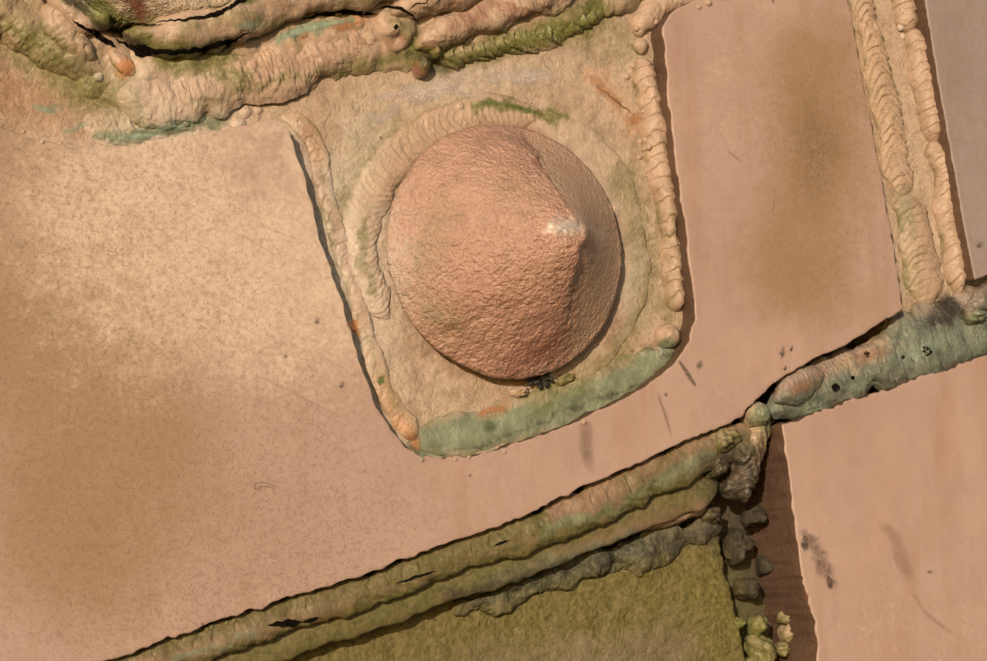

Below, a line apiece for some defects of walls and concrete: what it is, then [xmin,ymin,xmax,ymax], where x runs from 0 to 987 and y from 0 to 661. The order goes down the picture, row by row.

crack [72,0,251,58]
crack [302,0,440,24]